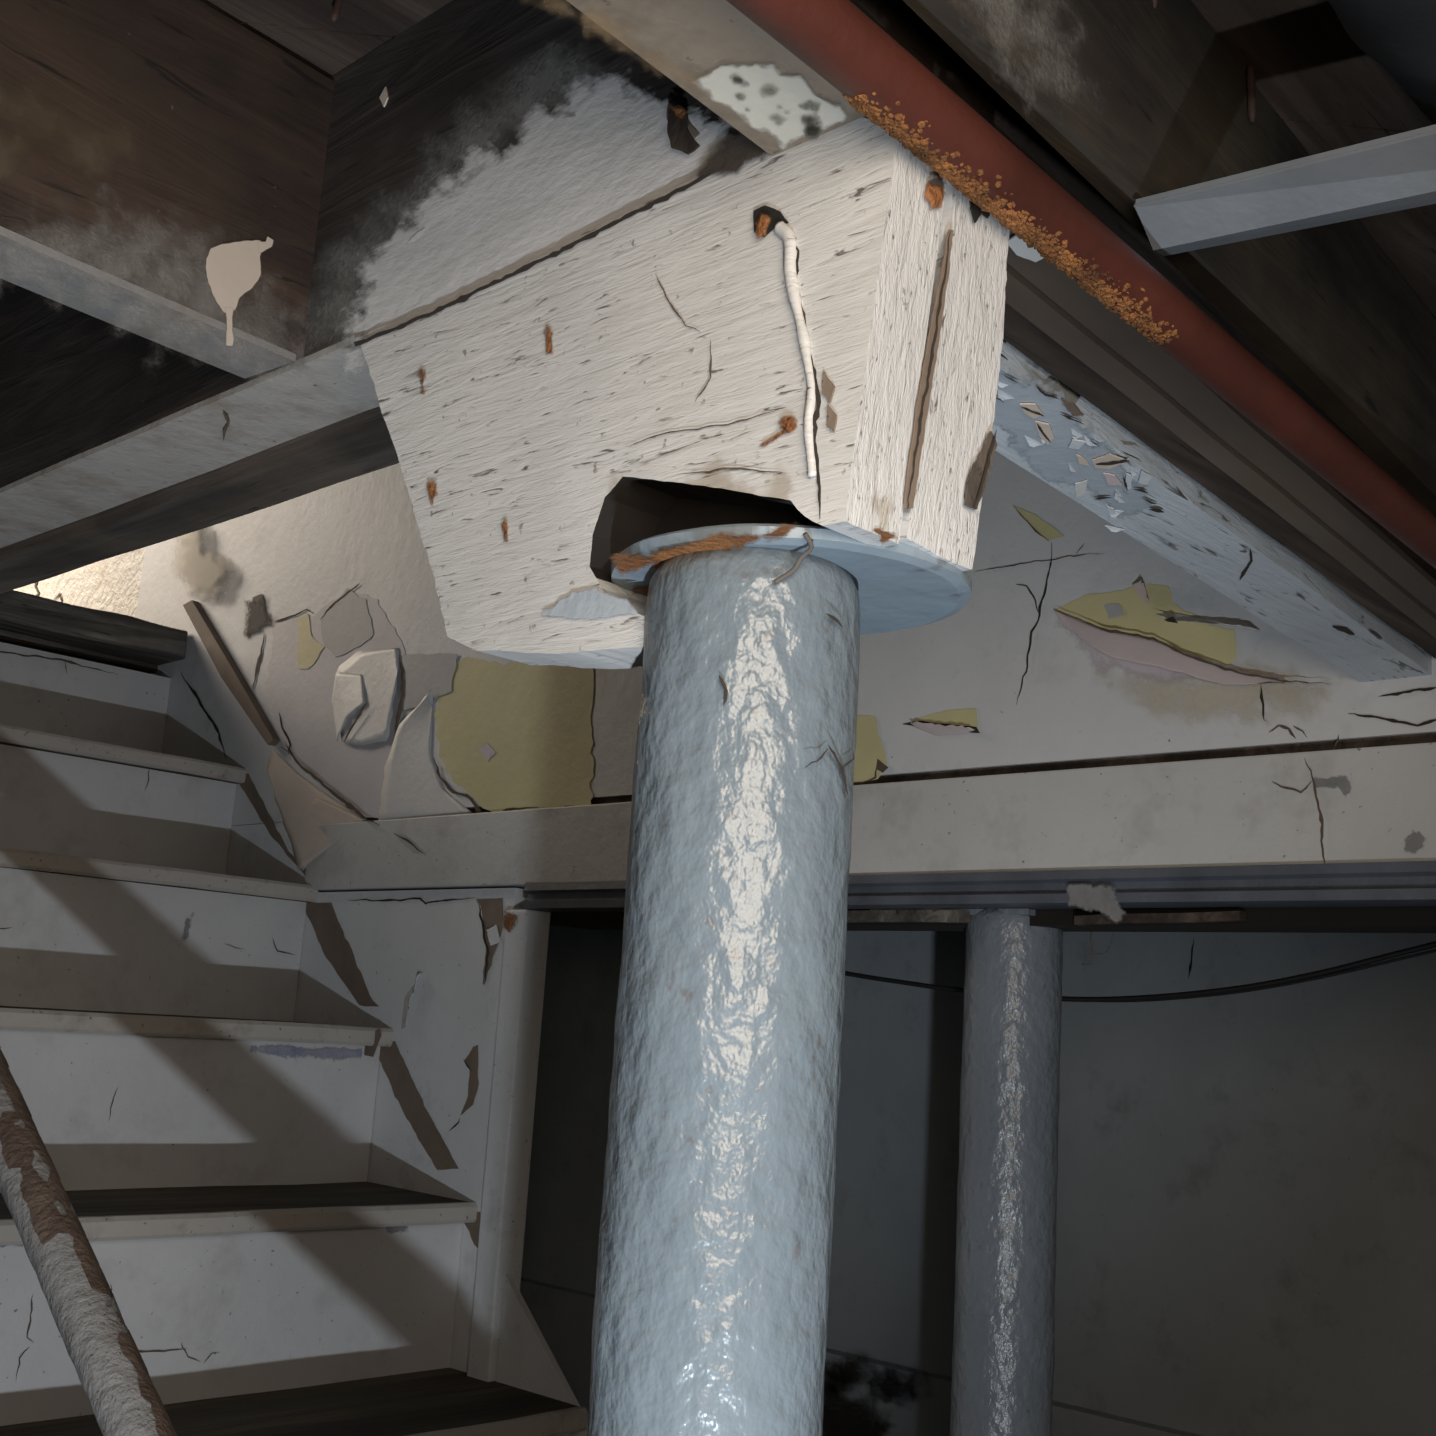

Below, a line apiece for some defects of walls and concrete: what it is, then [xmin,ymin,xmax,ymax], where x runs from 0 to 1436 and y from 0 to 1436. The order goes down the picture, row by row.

spalling [667,107,700,155]
corrosion [842,92,1179,346]
crack [903,229,954,510]
peeling [964,371,1164,532]
crack [975,542,1104,700]
peeling [1054,580,1327,685]
crack [1239,549,1253,581]
peeling [244,588,595,871]
crack [1260,687,1436,863]
peeling [476,898,503,985]
peeling [460,1045,479,1116]
mould [822,1357,917,1436]